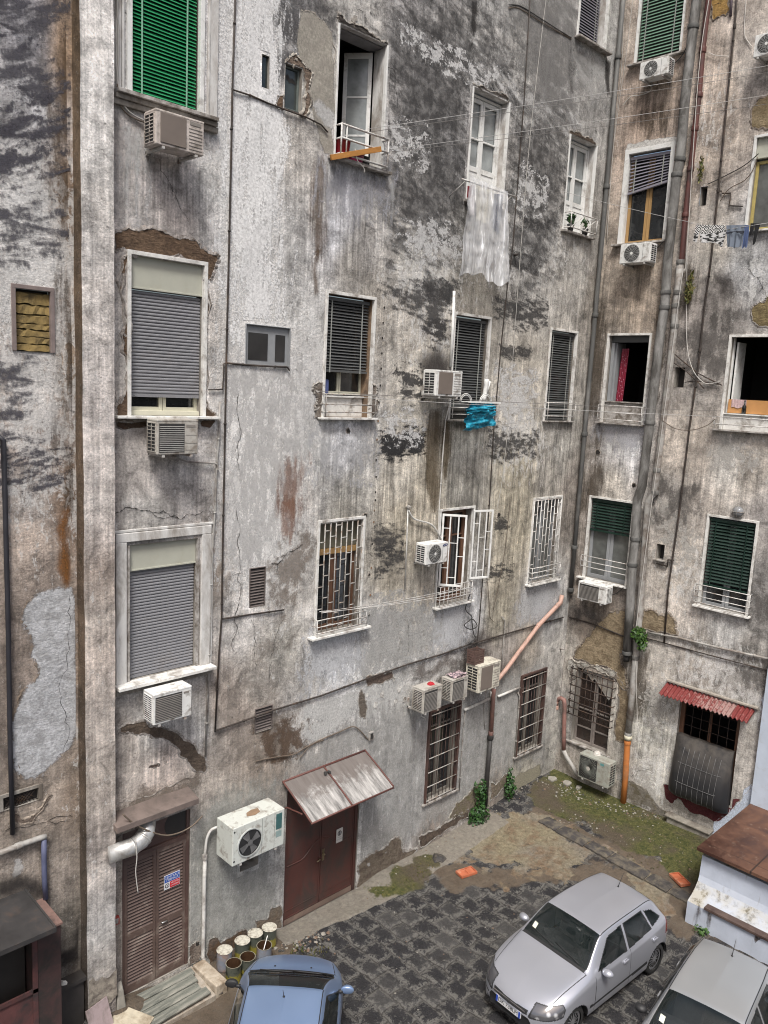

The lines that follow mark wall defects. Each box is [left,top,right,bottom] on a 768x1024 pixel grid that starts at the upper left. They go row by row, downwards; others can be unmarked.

spalling [749,94,768,132]
leakage [369,0,586,464]
rust [61,290,72,393]
spalling [114,223,221,430]
spalling [750,295,768,329]
leakage [376,361,451,512]
rust [58,469,73,583]
crack [115,507,203,519]
leakage [371,523,406,579]
spalling [569,607,679,743]
spalling [115,719,208,811]
spalling [355,771,512,889]